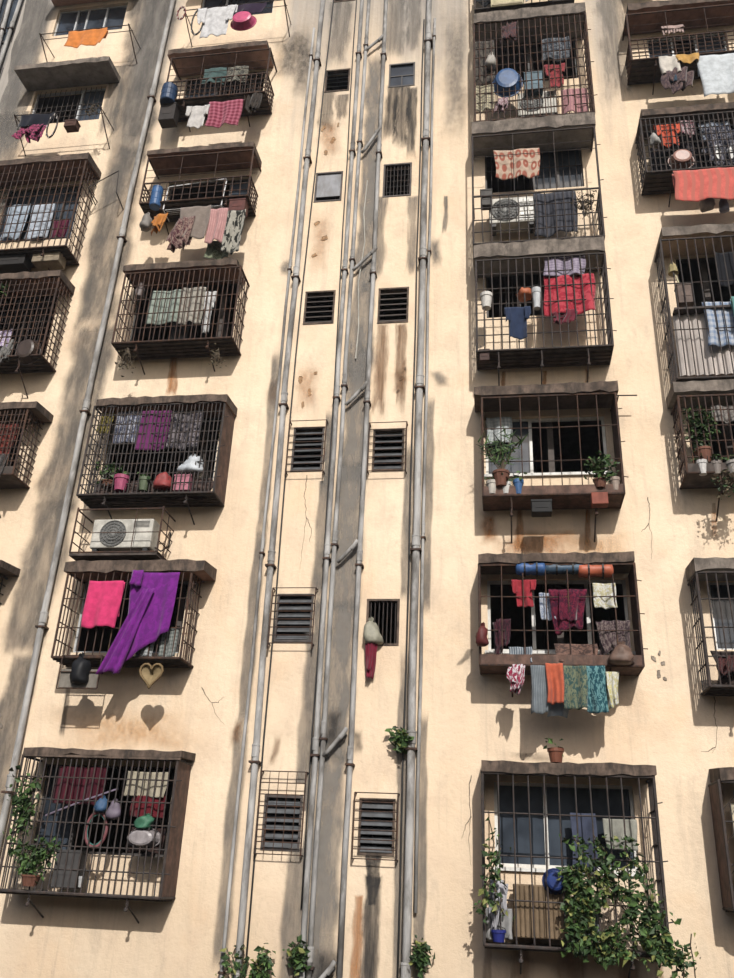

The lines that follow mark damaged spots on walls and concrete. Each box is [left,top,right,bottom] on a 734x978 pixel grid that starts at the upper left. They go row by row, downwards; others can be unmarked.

leakage [0,0,175,809]
corrosion [168,358,177,391]
corrosion [374,324,406,408]
leakage [425,405,433,514]
crack [300,477,312,563]
leakage [282,62,417,978]
corrosion [484,517,493,537]
leakage [414,784,426,947]
corrosion [351,897,362,978]